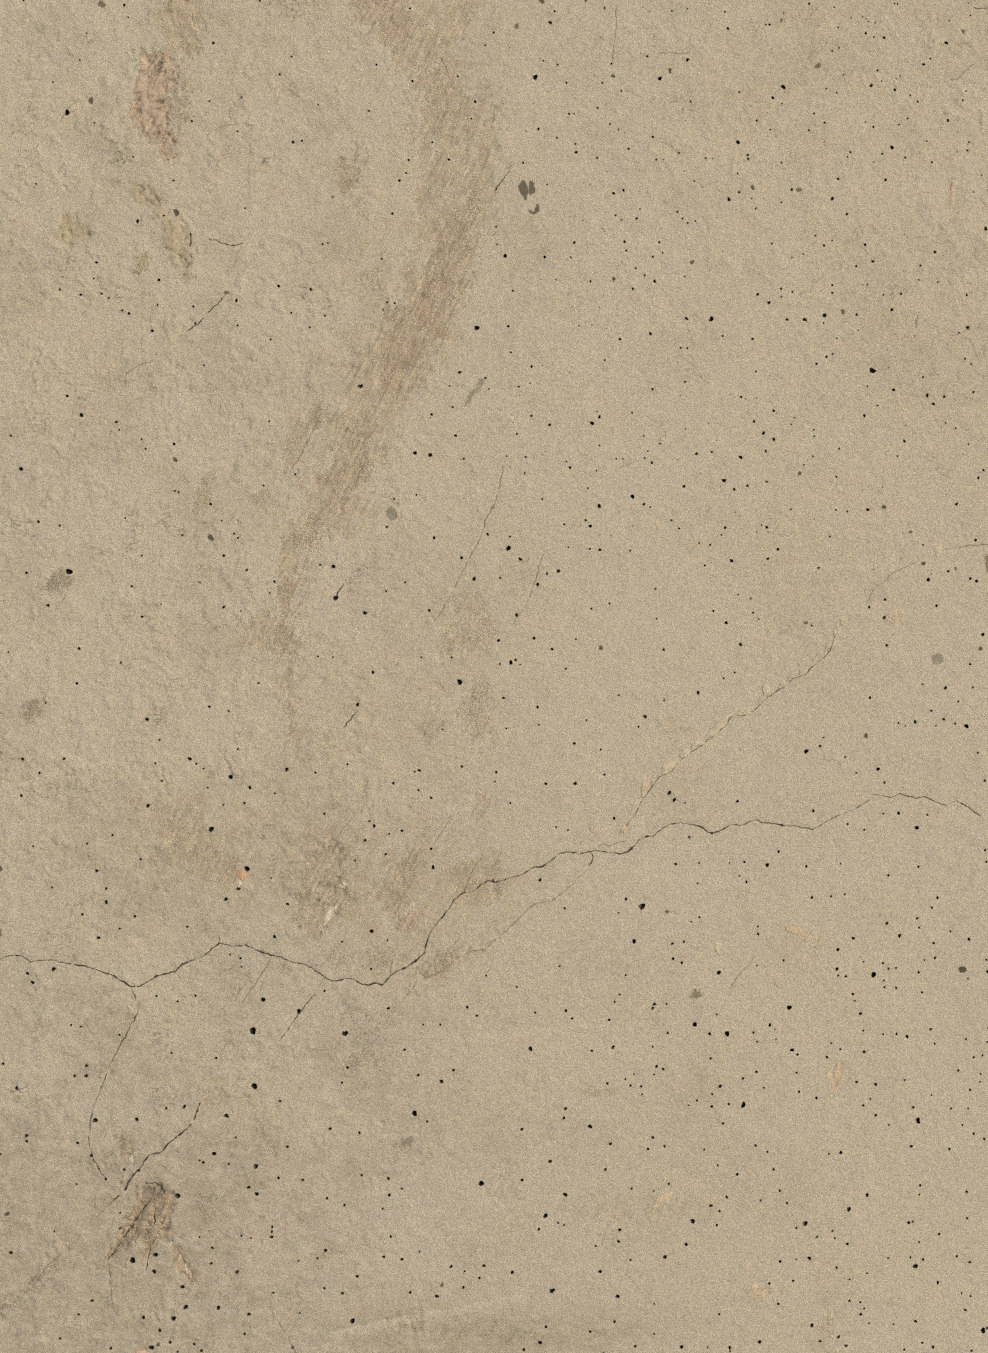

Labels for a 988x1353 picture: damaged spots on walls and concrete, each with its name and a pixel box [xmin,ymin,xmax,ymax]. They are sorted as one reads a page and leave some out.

spalling [128,49,179,160]
crack [0,543,988,1218]